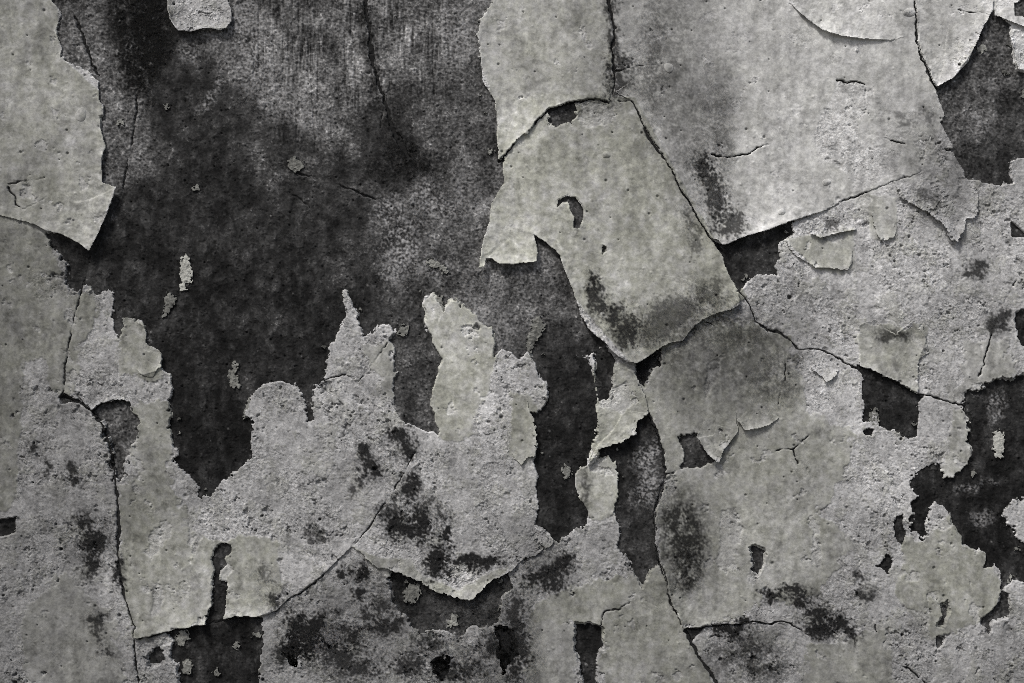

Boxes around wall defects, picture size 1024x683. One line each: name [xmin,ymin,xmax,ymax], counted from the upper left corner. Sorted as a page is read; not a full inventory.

crack [59,256,324,683]
water stain [350,442,383,493]
water stain [268,552,576,683]
water stain [376,420,505,584]
peeling [133,353,793,683]
peeling [0,0,929,499]
crack [534,0,723,252]
water stain [693,152,748,243]
crack [647,412,808,683]
crack [736,289,965,409]
peeling [894,375,1024,634]
peeling [896,0,1024,242]